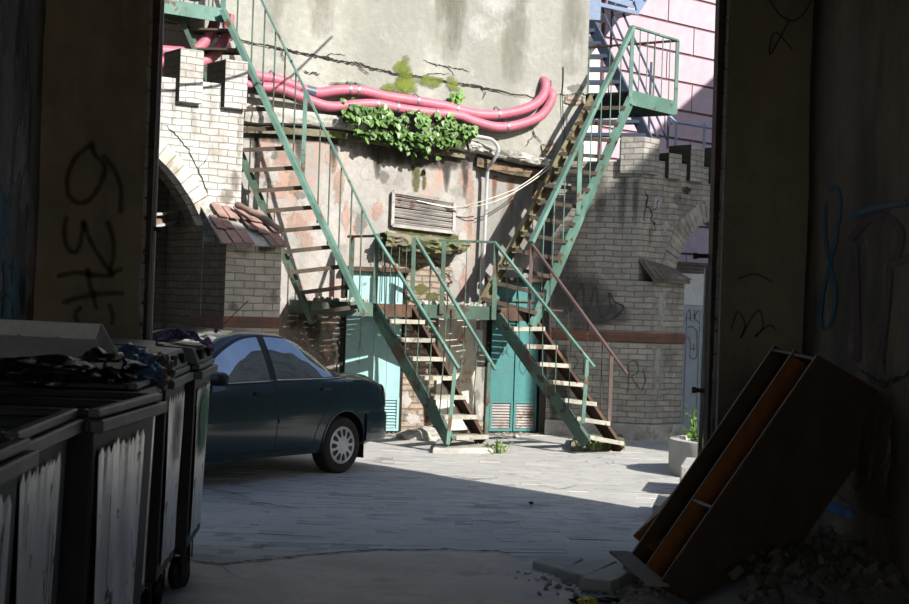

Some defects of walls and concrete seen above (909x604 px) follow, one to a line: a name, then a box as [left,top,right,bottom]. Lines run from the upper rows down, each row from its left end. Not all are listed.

crack [216,36,528,99]
crack [163,124,208,194]
flaking render [250,139,384,248]
damp [362,143,468,191]
spalling [379,167,474,308]
spalling [541,141,556,156]
crack [643,190,659,229]
spalling [289,313,341,372]
spalling [404,317,438,394]
spalling [401,372,434,431]
crack [190,548,511,581]